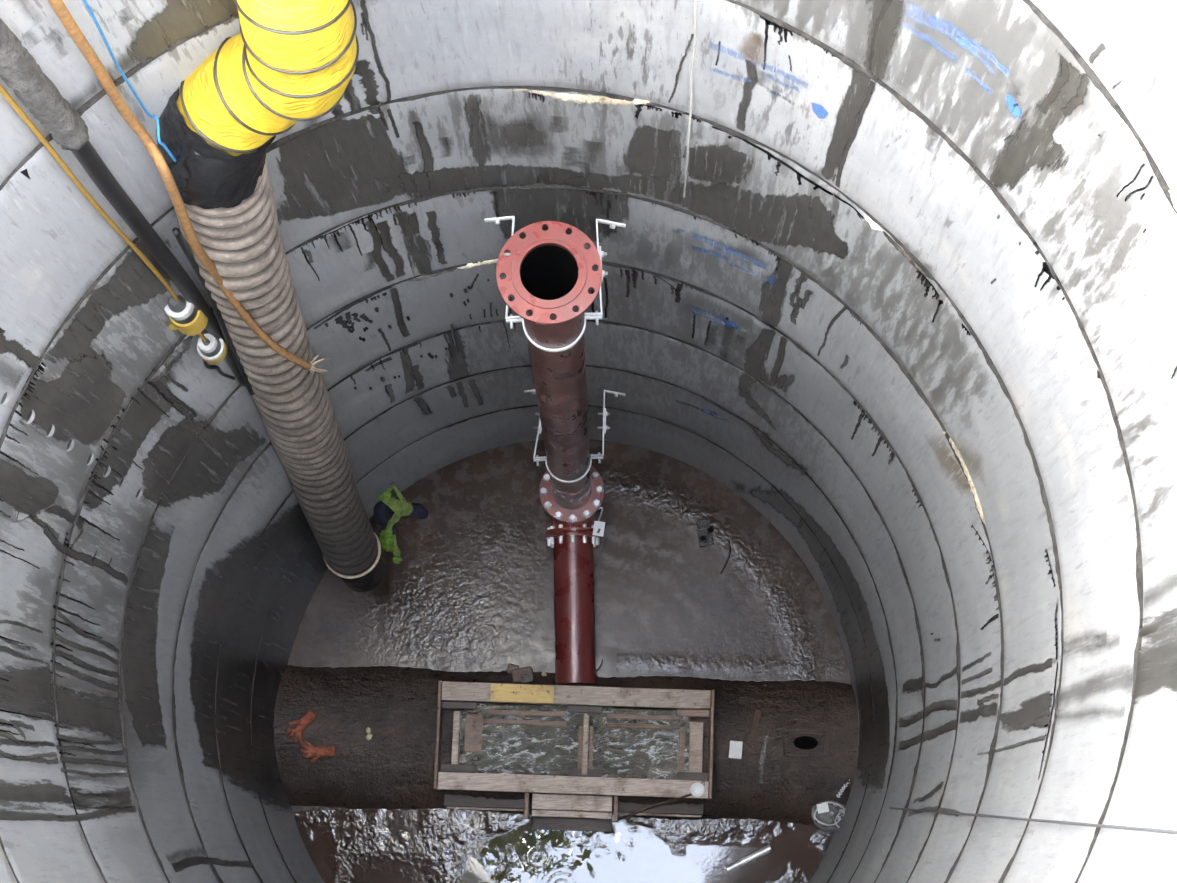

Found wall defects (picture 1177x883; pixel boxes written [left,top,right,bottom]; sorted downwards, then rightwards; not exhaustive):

damp [276,0,903,429]
damp [989,43,1105,190]
damp [0,242,265,821]
damp [935,447,977,487]
damp [737,485,1177,787]
damp [908,782,959,816]